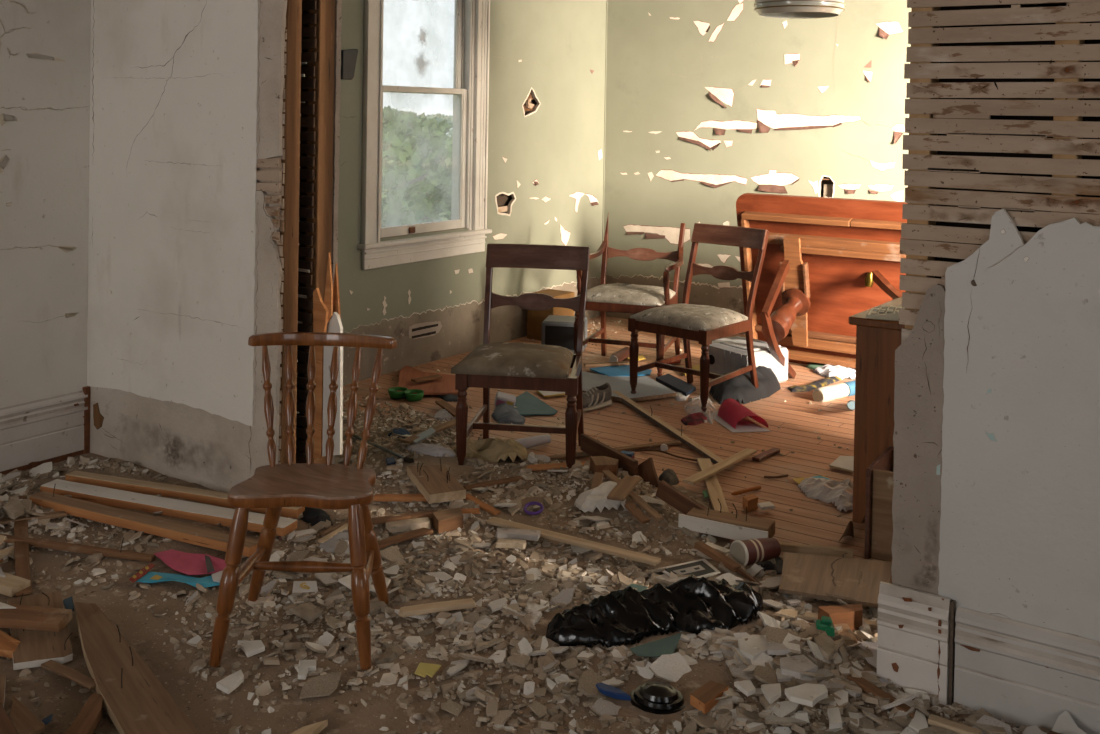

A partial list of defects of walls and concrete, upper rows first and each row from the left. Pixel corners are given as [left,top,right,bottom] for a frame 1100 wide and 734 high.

peeling [693,0,744,42]
peeling [784,53,801,67]
crack [0,0,224,170]
flaking render [522,87,541,117]
peeling [748,79,772,88]
peeling [676,87,861,151]
peeling [620,150,904,202]
flaking render [495,179,551,216]
peeling [569,191,599,213]
flaking render [74,0,287,493]
peeling [544,217,571,246]